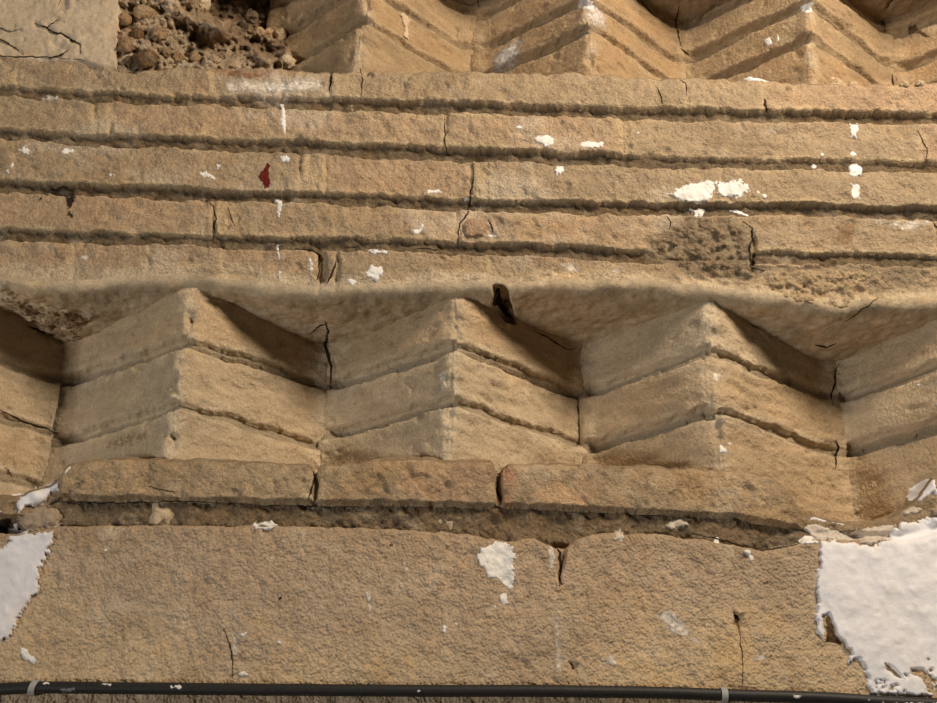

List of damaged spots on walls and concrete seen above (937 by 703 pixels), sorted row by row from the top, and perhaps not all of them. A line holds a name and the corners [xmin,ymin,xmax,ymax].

crack [0,0,84,61]
spalling [116,0,297,73]
crack [458,164,493,248]
crack [310,321,333,386]
peeling [12,467,71,513]
peeling [0,524,57,642]
crack [554,541,562,586]
peeling [798,479,937,697]
peeling [20,647,37,664]